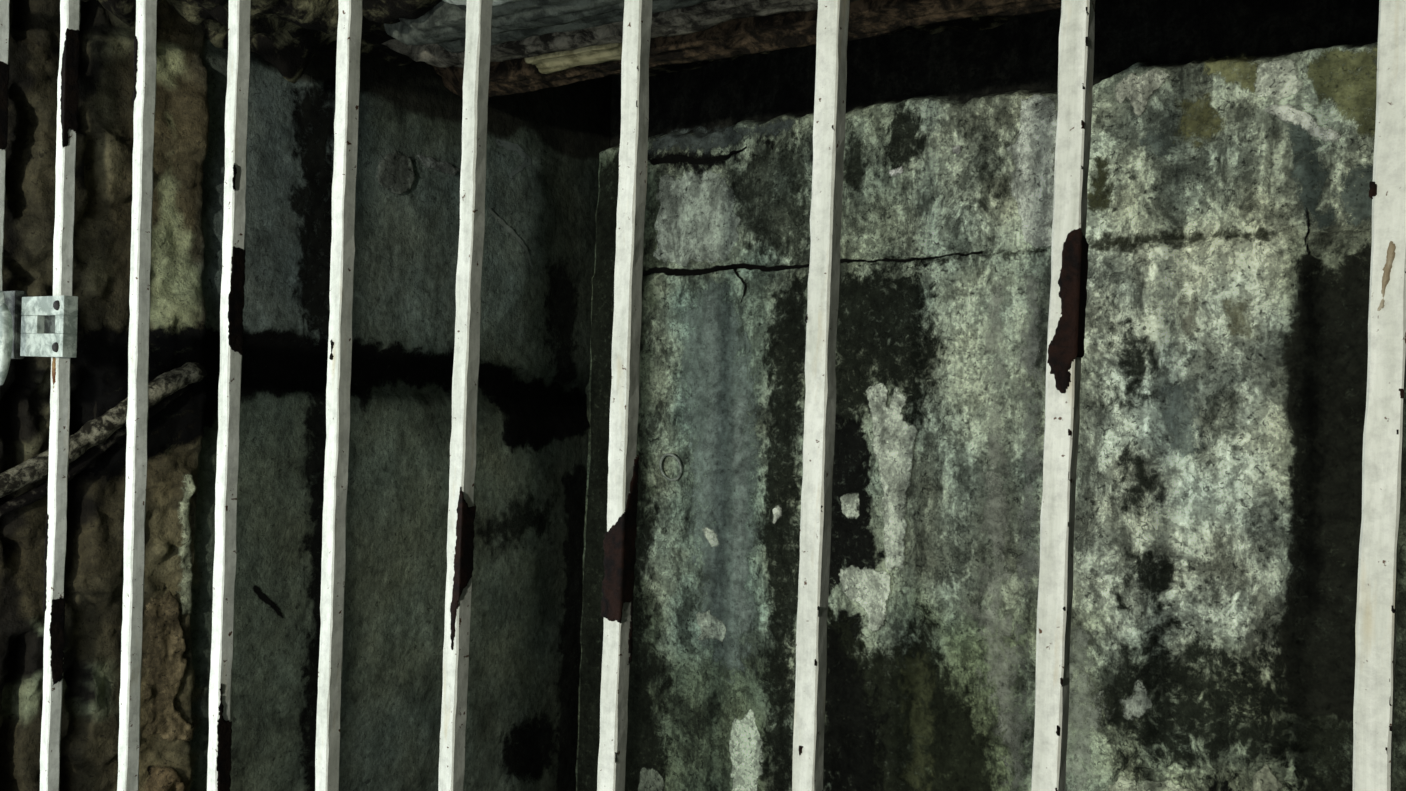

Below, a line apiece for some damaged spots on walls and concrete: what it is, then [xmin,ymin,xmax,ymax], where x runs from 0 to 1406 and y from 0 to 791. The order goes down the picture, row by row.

leakage [843,99,929,191]
leakage [1087,156,1113,212]
leakage [1285,113,1373,230]
crack [642,247,1045,302]
crack [1088,227,1270,255]
leakage [823,255,1002,791]
leakage [1066,243,1372,791]